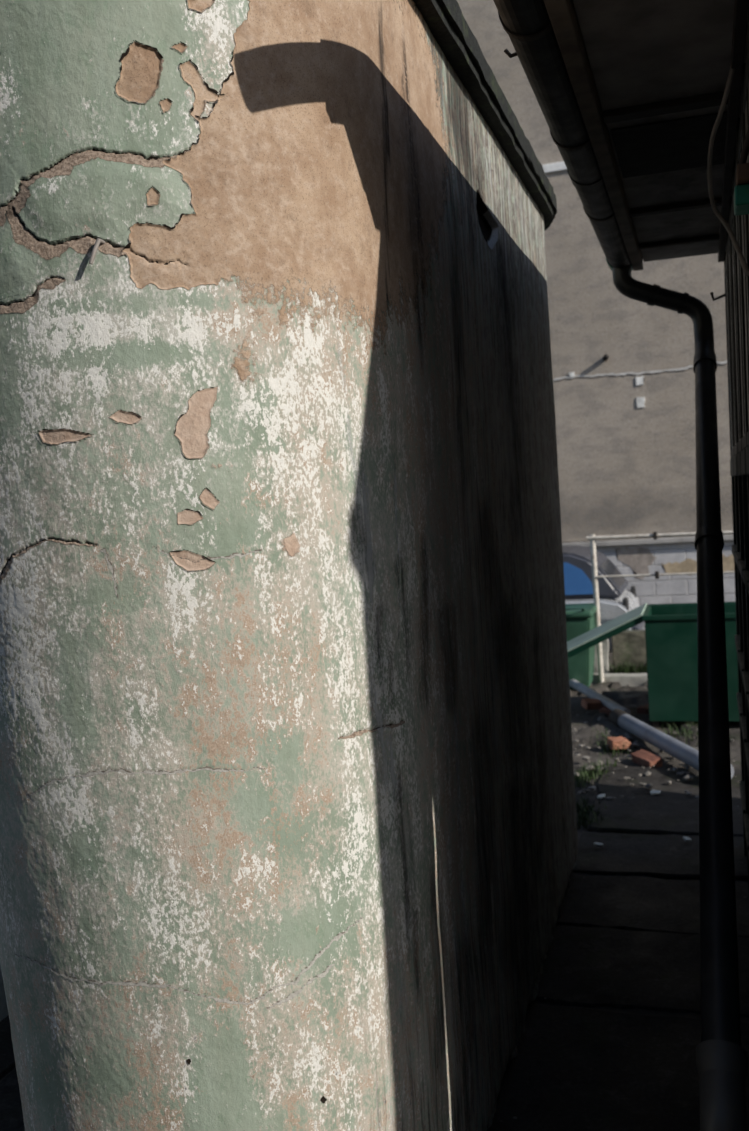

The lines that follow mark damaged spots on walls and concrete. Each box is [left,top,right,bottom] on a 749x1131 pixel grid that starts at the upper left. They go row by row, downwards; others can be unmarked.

damp [379,25,390,212]
damp [435,42,482,227]
crack [0,149,191,314]
peeling [38,428,94,445]
peeling [108,410,142,424]
peeling [174,387,222,467]
peeling [177,488,220,525]
crack [0,538,118,597]
peeling [169,549,215,571]
peeling [282,533,300,556]
crack [338,720,405,739]